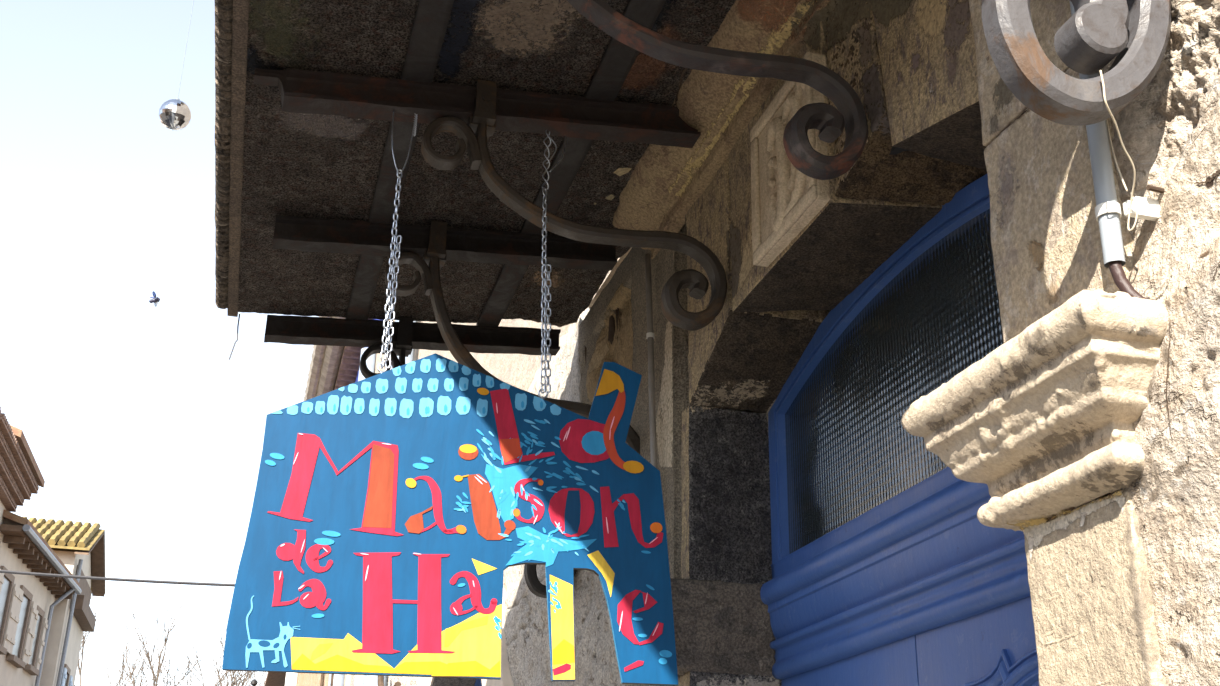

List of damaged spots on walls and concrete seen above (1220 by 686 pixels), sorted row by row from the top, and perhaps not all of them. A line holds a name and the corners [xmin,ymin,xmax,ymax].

crack [1194,169,1220,185]
crack [1164,322,1174,442]
peeling [1007,491,1125,559]